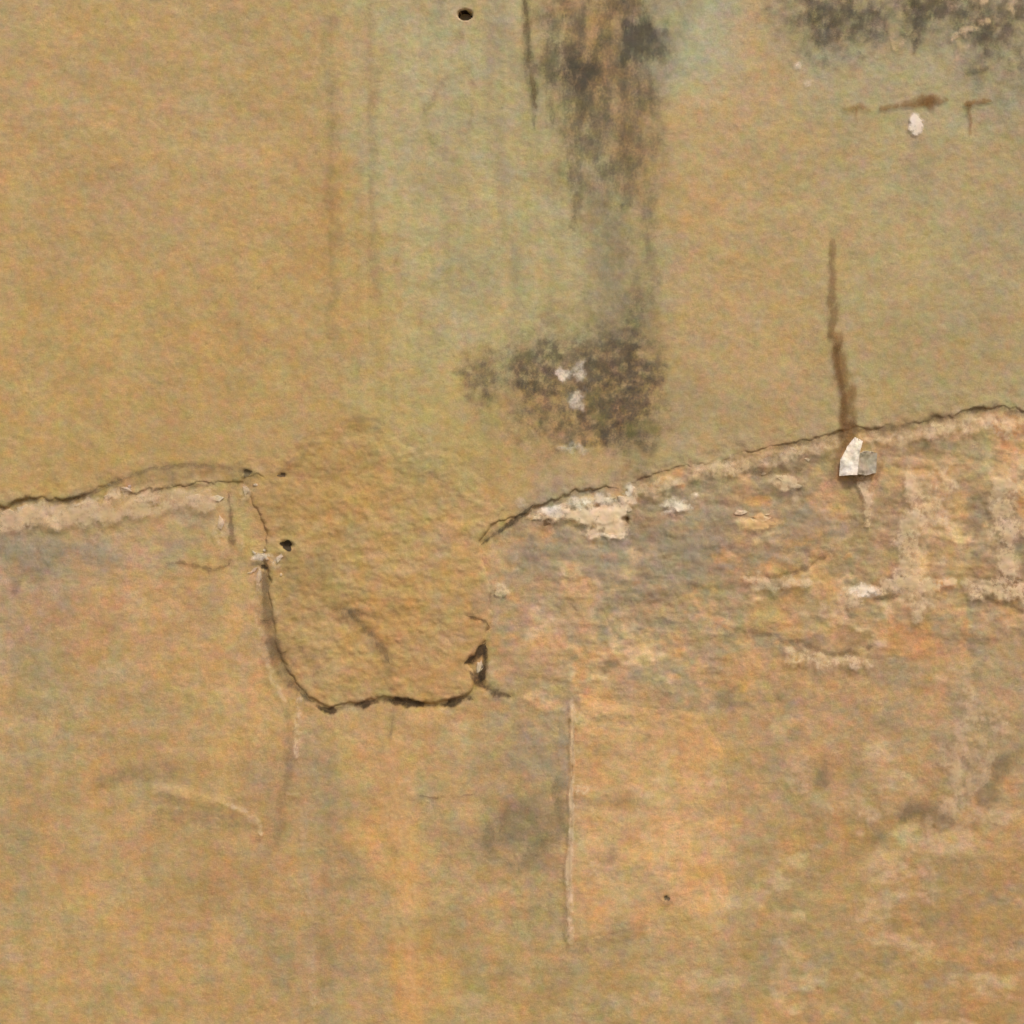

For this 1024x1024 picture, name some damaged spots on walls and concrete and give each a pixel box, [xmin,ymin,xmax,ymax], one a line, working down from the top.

corrosion [909,113,924,135]
water stain [556,369,584,382]
crack [483,504,534,543]
crack [303,615,511,714]
peeling [0,406,1024,1024]